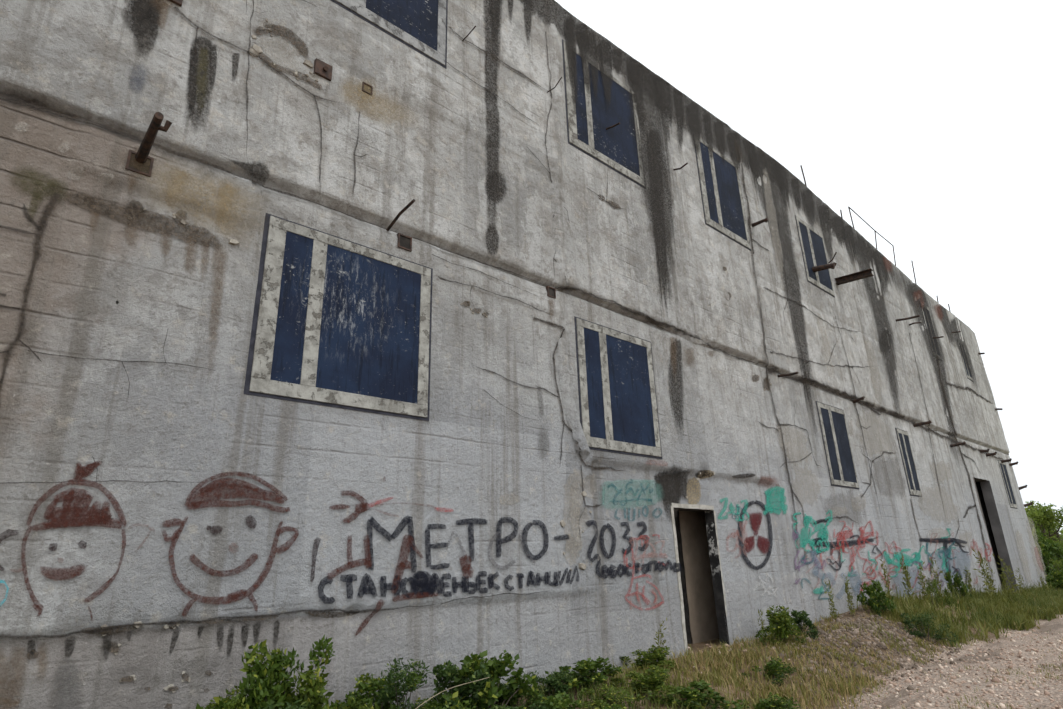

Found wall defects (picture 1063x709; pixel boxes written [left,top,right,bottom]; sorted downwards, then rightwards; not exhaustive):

water stain [124,0,163,55]
water stain [187,37,217,128]
water stain [484,0,976,444]
crack [0,0,1010,587]
water stain [58,637,76,708]
water stain [217,623,260,655]
crack [0,591,548,639]